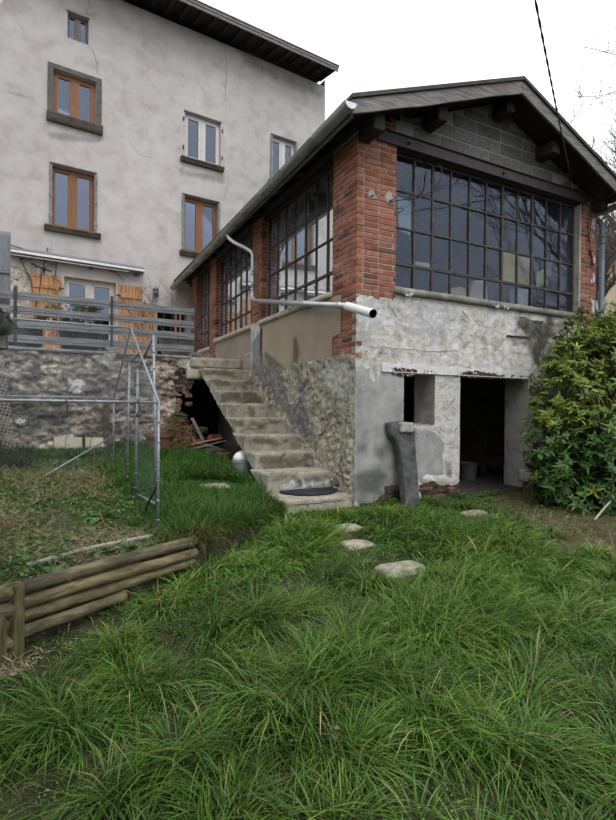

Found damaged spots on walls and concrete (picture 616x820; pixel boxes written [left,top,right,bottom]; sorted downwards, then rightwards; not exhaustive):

damp [517,315,563,362]
peeling [391,367,436,377]
peeling [457,370,526,380]
spalling [419,481,459,499]